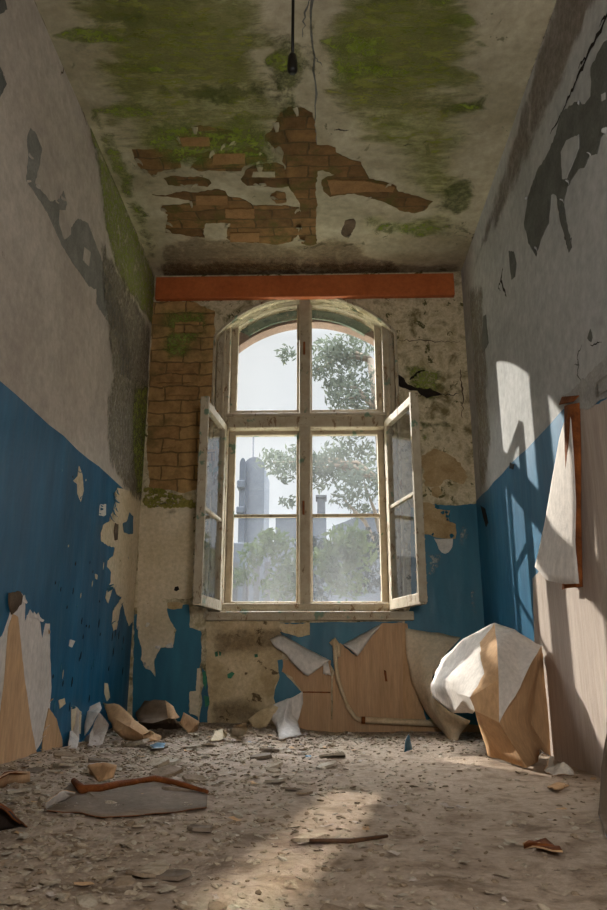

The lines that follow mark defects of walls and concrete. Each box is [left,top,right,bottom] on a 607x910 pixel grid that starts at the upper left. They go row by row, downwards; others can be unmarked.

crack [550,14,607,134]
flaking render [132,107,433,246]
spalling [524,37,607,256]
spalling [26,128,131,381]
spalling [509,251,517,280]
spalling [61,467,86,502]
flaking render [92,301,227,674]
peeling [413,498,457,554]
spalling [421,449,468,487]
spalling [69,705,82,734]